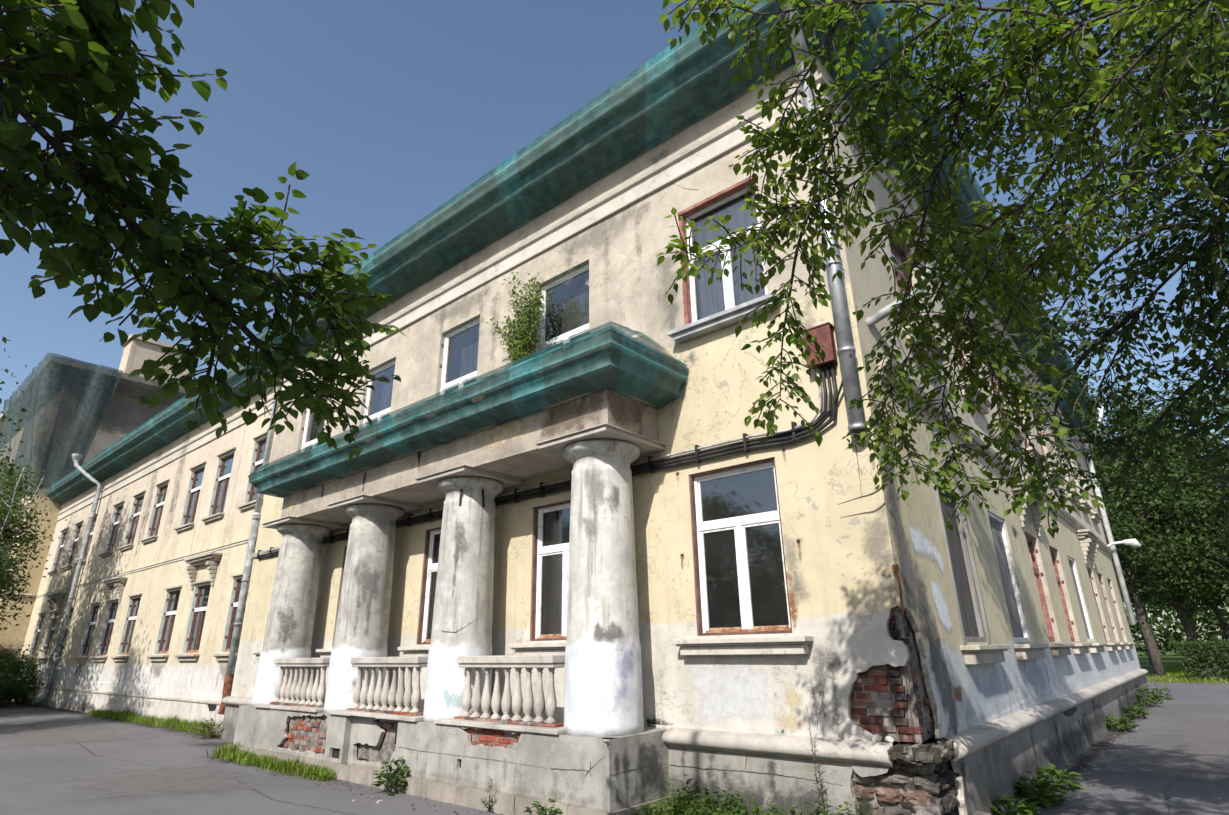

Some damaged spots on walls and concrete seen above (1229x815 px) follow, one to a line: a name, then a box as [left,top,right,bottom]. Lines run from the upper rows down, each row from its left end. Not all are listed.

leakage [354,566,379,632]
leakage [869,444,1001,734]
spalling [279,715,327,754]
spalling [357,720,398,764]
spalling [464,728,521,751]
crack [399,747,842,792]
leakage [615,734,825,815]
leakage [812,650,840,715]
spalling [833,606,960,815]